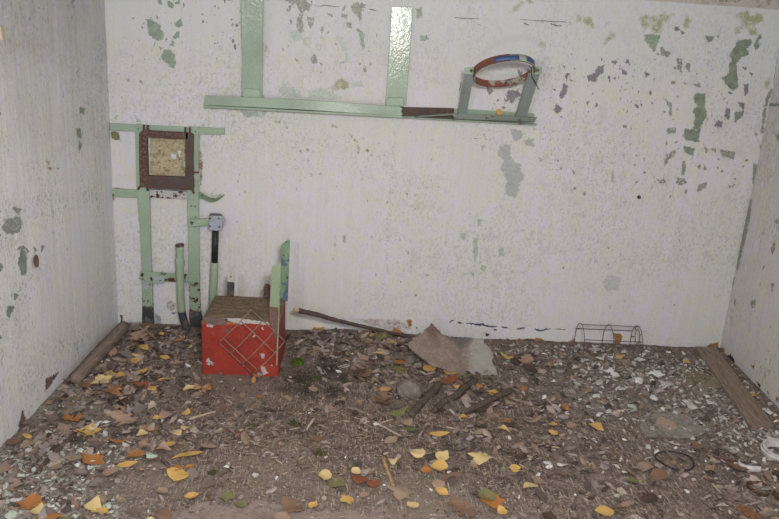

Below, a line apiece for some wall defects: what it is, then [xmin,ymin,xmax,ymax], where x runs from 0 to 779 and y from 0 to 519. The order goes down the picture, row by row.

peeling [141,0,190,68]
peeling [280,0,377,73]
peeling [487,69,529,110]
peeling [550,66,575,118]
peeling [587,58,653,128]
peeling [635,34,762,197]
peeling [745,88,779,136]
peeling [497,128,543,199]
peeling [0,206,23,237]
peeling [17,245,44,275]
peeling [732,195,753,287]